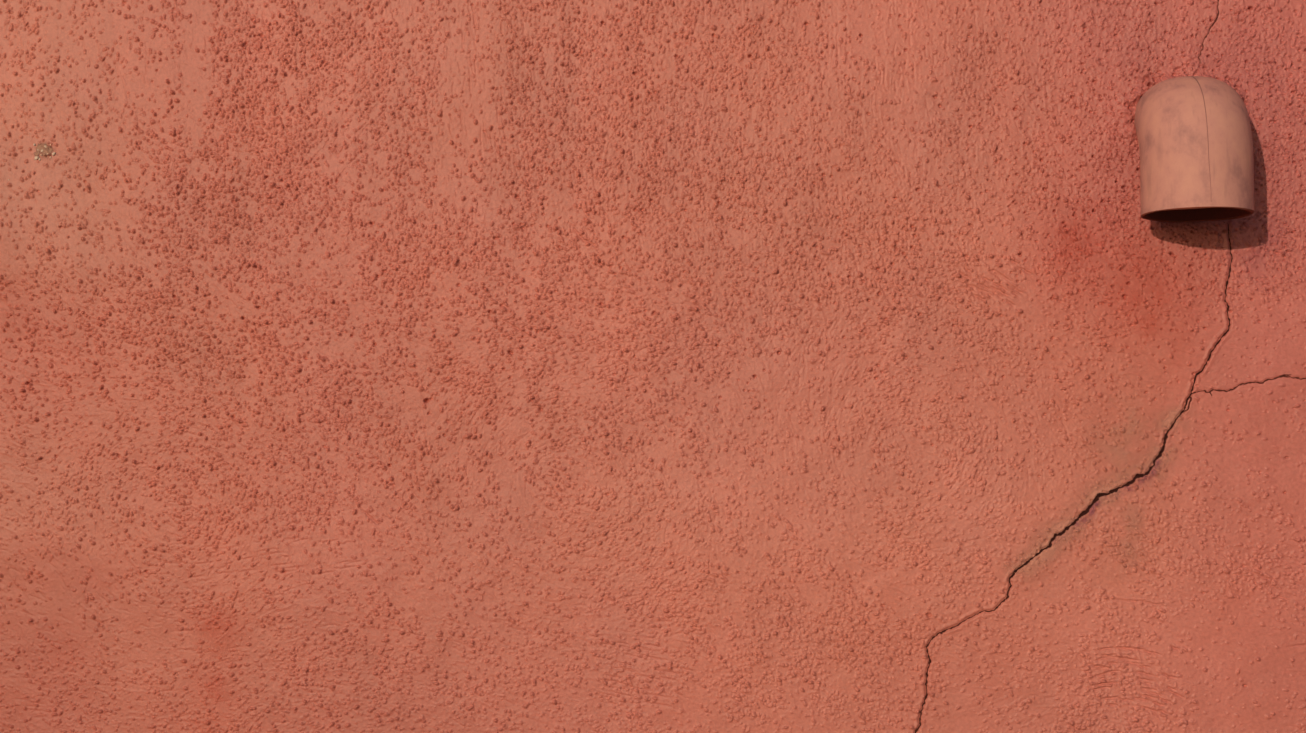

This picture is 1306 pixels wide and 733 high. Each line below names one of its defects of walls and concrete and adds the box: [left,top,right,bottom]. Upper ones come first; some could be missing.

crack [915,225,1306,733]